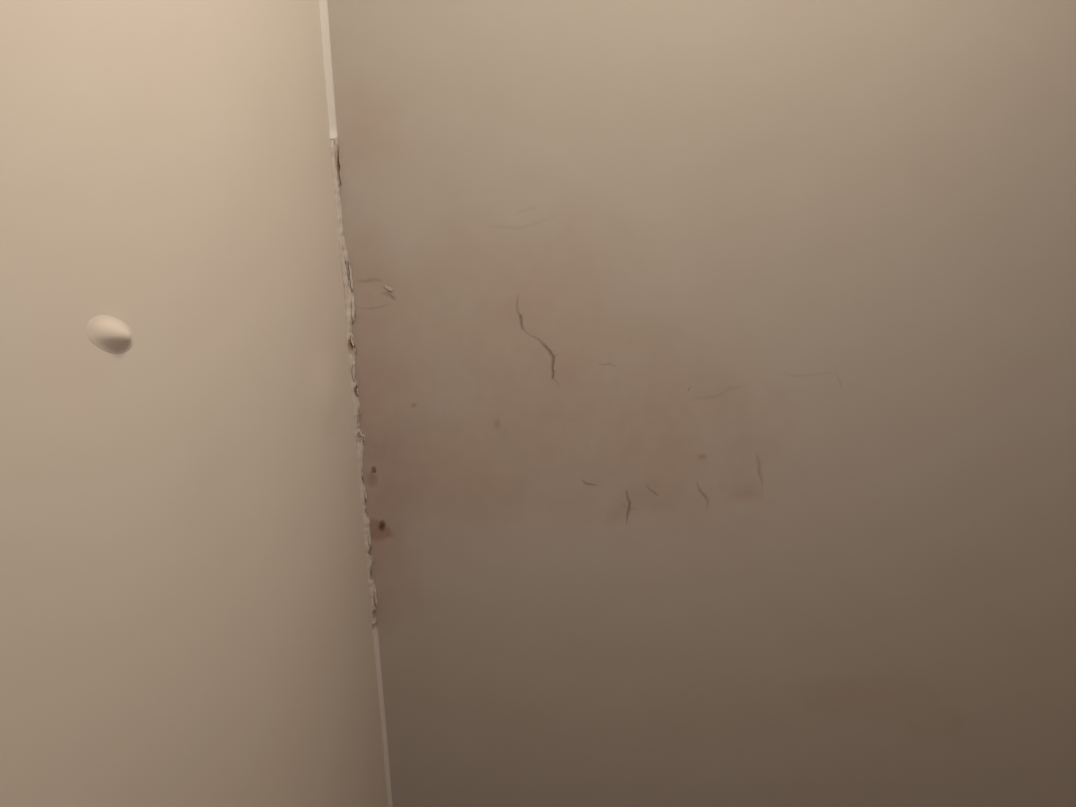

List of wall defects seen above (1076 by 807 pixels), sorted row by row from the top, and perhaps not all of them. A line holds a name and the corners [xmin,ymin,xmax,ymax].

crack [517,296,555,378]